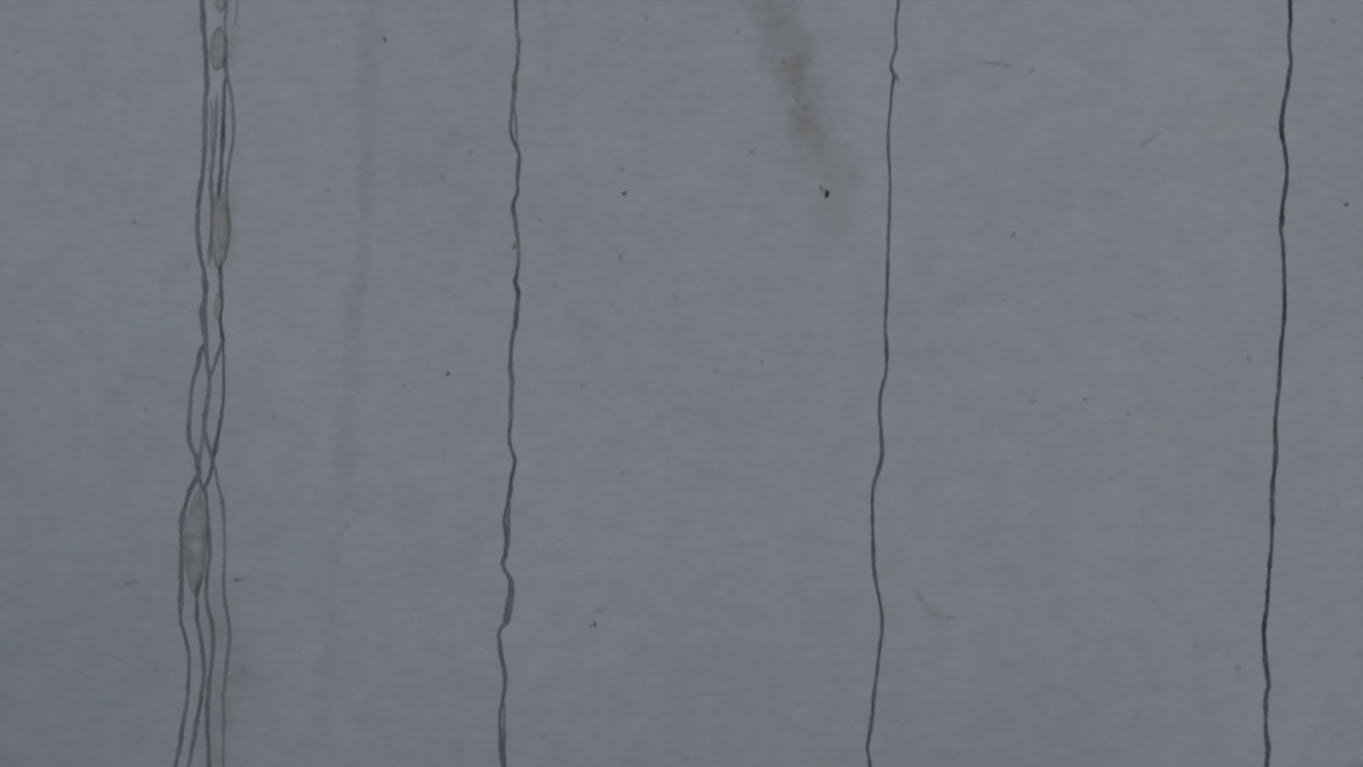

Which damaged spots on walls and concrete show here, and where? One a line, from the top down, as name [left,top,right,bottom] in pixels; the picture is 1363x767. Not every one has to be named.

crack [174,0,238,767]
crack [496,0,521,767]
crack [866,0,900,767]
crack [1262,0,1293,767]